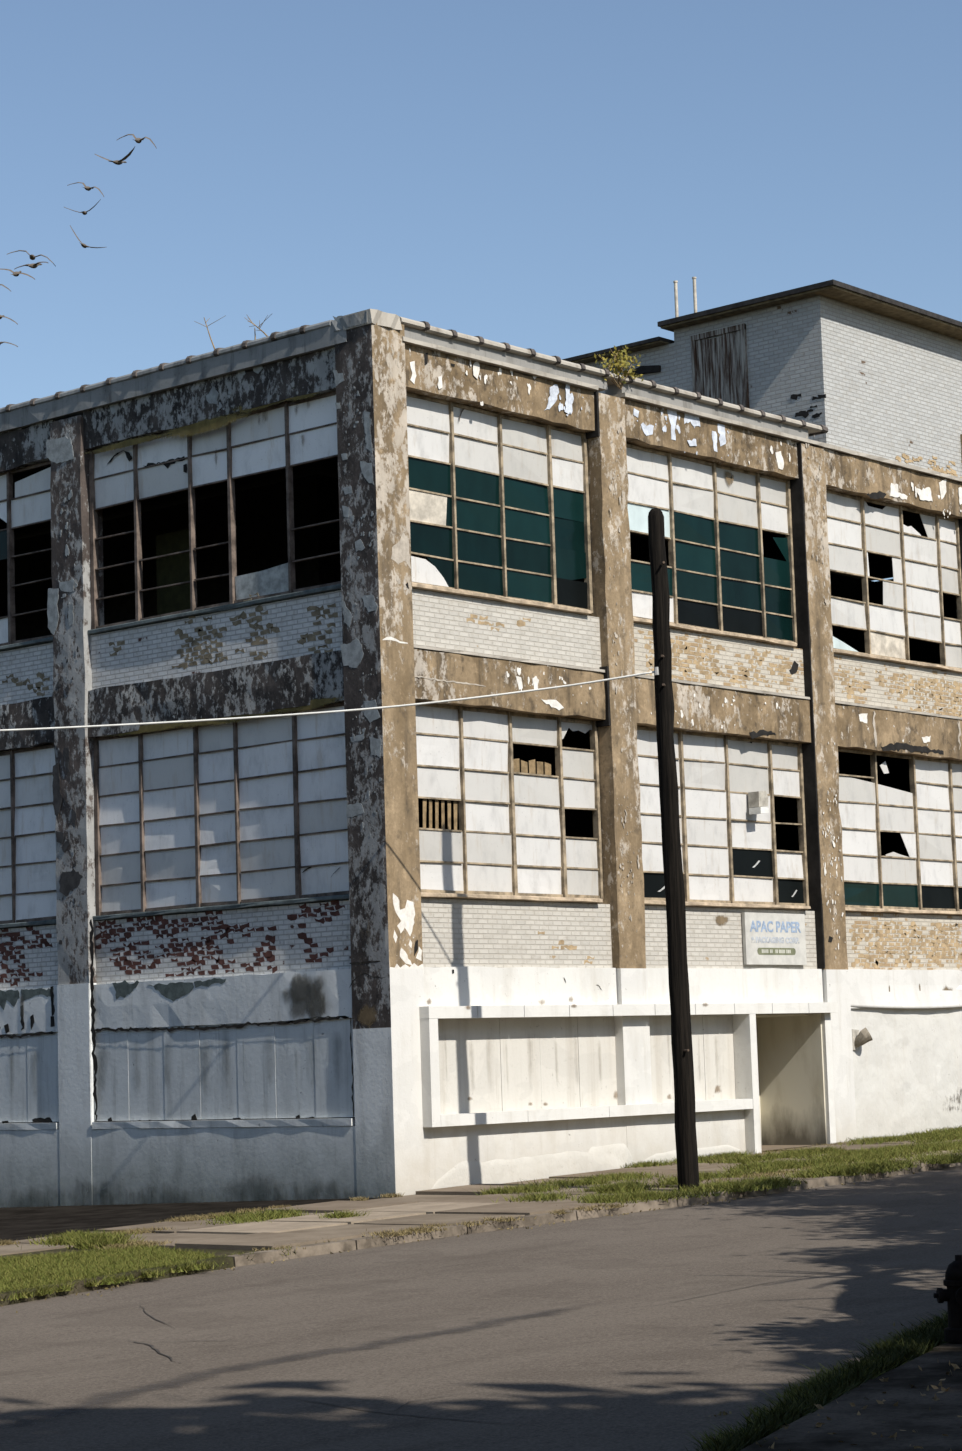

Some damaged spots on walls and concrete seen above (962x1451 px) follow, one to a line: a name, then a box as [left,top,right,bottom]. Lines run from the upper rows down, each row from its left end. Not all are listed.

peeling [46,430,78,635]
peeling [391,532,411,618]
peeling [333,338,583,575]
peeling [607,408,729,553]
flaking render [172,592,280,669]
peeling [506,665,591,710]
flaking render [644,631,799,739]
peeling [0,747,83,1033]
peeling [95,900,345,1001]
water stain [284,977,325,1018]
peeling [393,893,422,965]
flaking render [822,788,962,969]